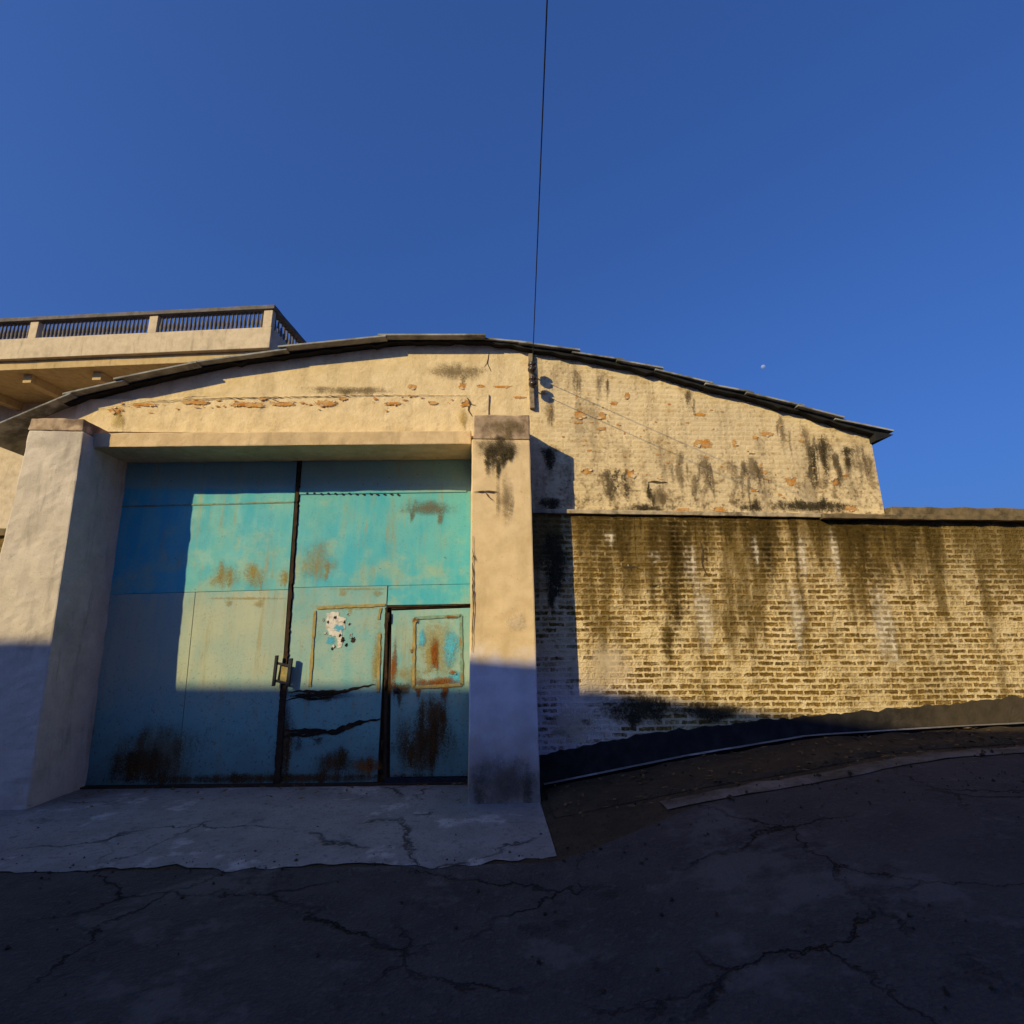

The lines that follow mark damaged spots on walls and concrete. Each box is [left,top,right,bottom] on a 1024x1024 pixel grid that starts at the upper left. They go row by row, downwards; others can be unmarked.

leakage [442,366,477,383]
flaking render [107,397,347,415]
flaking render [372,383,525,411]
flaking render [694,428,714,457]
flaking render [732,439,797,499]
corrosion [410,501,447,522]
leakage [573,440,945,664]
leakage [548,555,562,613]
corrosion [146,640,455,785]